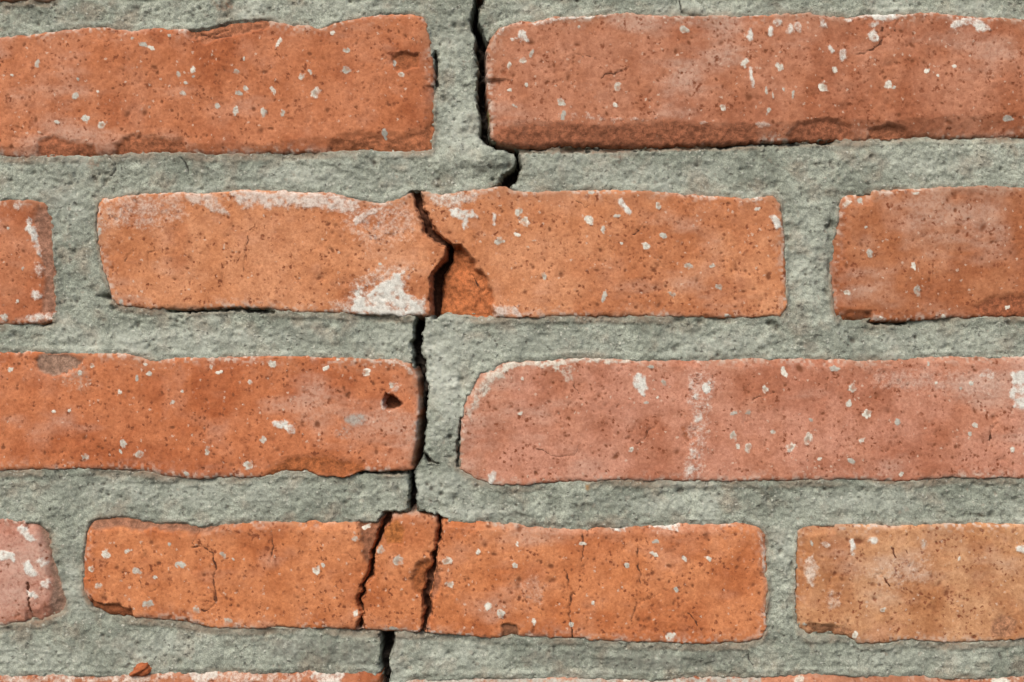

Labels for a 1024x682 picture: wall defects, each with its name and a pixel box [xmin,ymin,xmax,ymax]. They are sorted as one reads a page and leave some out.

crack [431,50,440,89]
crack [470,0,543,188]
crack [700,140,836,151]
crack [340,192,481,682]